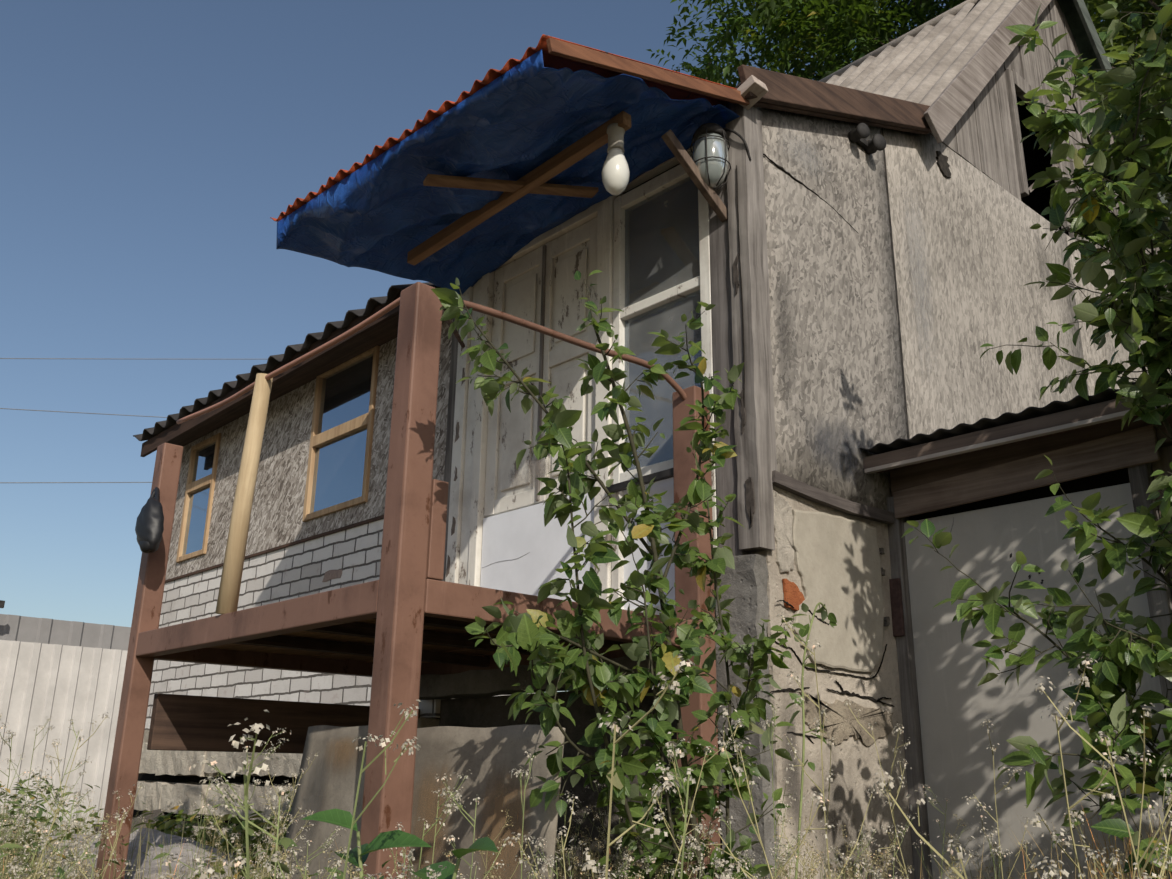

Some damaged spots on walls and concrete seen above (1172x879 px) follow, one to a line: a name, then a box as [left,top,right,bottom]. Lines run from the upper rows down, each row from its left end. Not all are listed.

spalling [773,490,805,611]
crack [770,600,895,707]
crack [790,732,826,744]